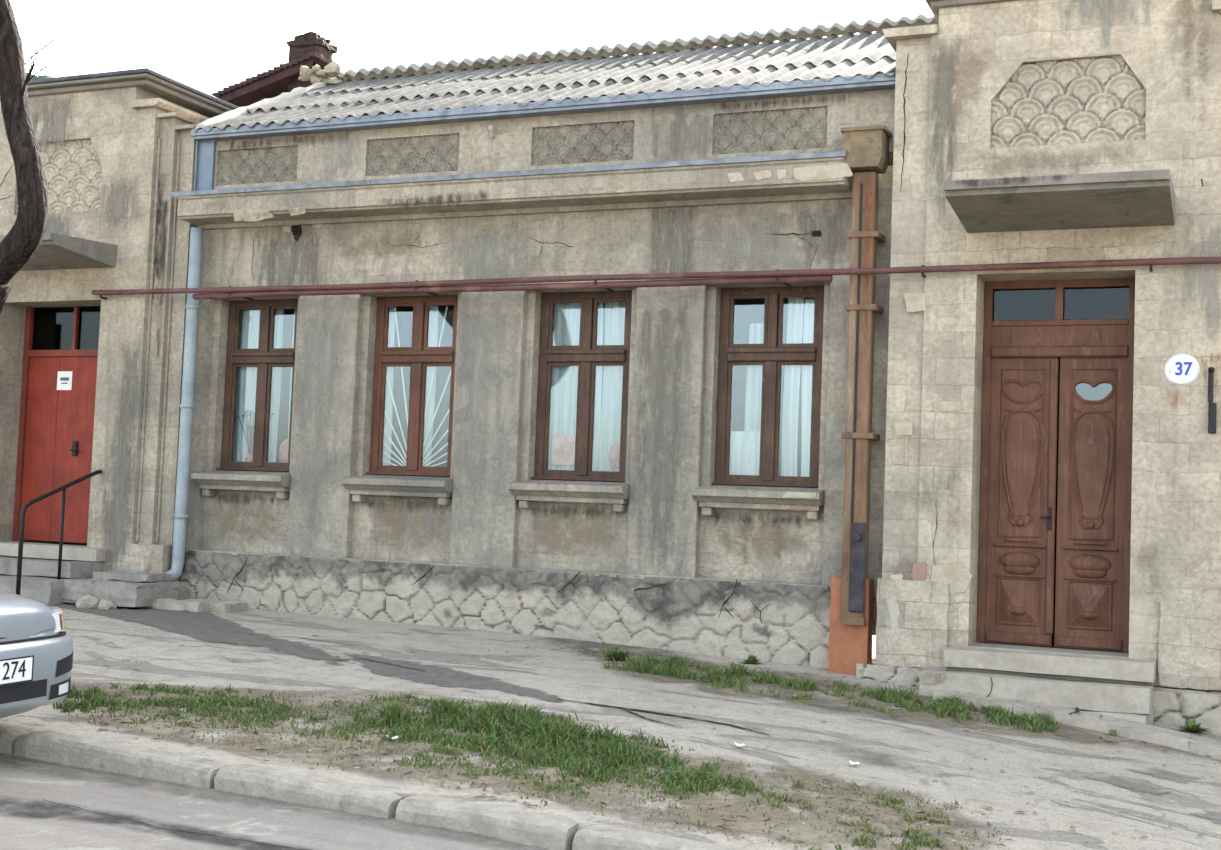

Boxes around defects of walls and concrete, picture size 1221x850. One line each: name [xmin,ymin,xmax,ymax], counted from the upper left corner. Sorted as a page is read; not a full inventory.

crack [901,54,909,187]
leakage [931,45,982,200]
leakage [994,156,1091,184]
crack [769,230,822,270]
crack [558,571,582,593]
crack [718,579,772,624]